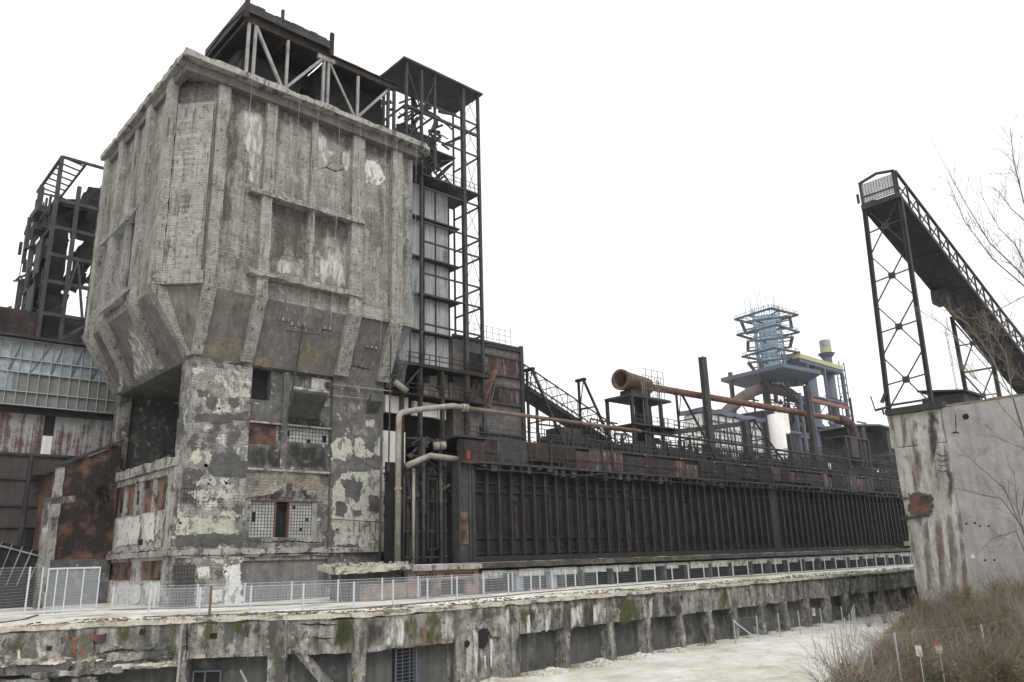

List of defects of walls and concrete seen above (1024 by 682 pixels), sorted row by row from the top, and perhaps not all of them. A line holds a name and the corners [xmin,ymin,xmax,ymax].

water stain [223,93,265,221]
water stain [282,111,351,171]
peeling [364,159,386,188]
water stain [273,203,345,287]
peeling [194,366,251,424]
peeling [328,419,385,547]
water stain [902,412,938,486]
peeling [109,448,249,607]
water stain [920,514,968,595]
water stain [335,619,351,644]
water stain [505,604,600,633]
water stain [620,594,683,625]